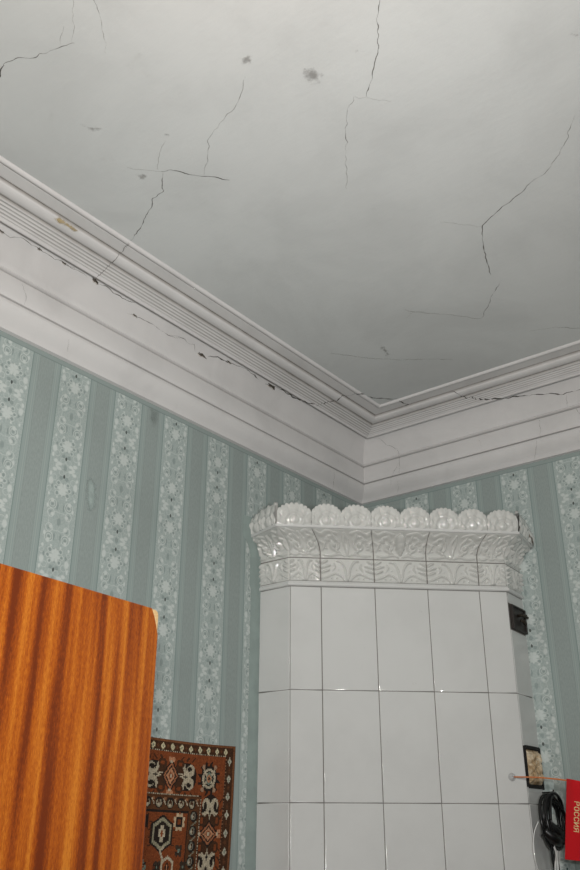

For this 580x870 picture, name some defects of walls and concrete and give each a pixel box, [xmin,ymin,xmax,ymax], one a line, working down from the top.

crack [0,1,106,77]
crack [345,1,380,143]
crack [0,80,409,406]
crack [407,119,574,319]
crack [453,389,580,401]